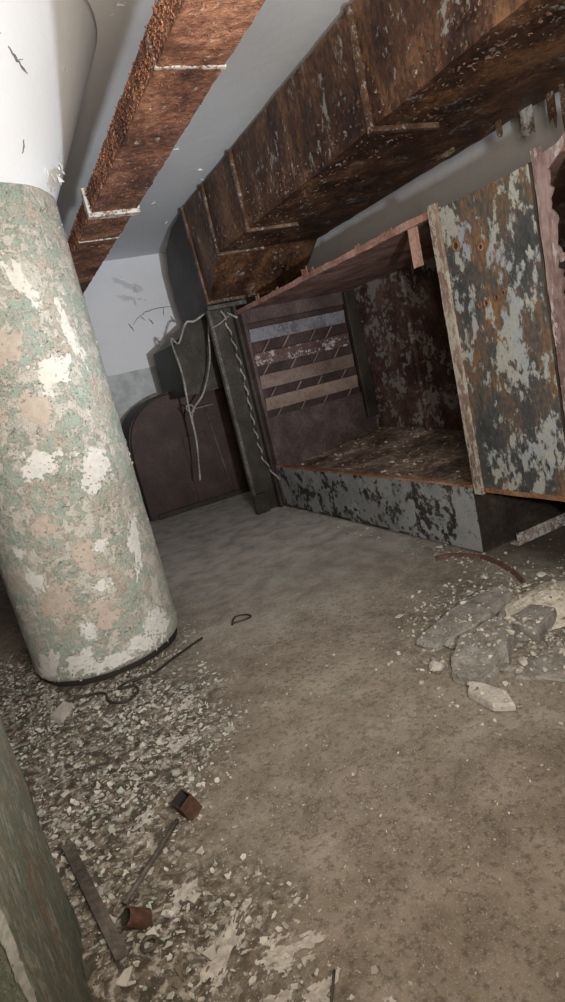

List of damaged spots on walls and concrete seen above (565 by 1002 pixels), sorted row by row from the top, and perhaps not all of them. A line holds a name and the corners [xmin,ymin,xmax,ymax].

peeling [19,443,114,495]
peeling [12,544,49,596]
peeling [91,536,110,552]
peeling [91,577,115,597]
peeling [127,506,143,588]